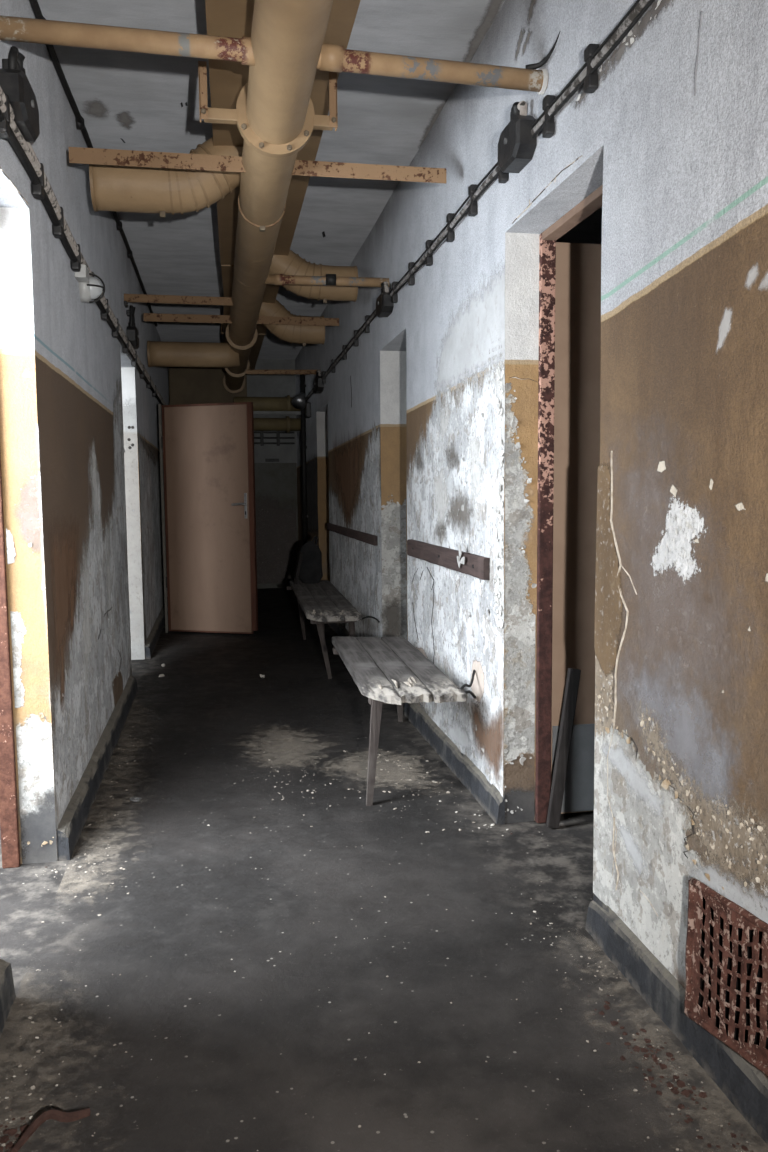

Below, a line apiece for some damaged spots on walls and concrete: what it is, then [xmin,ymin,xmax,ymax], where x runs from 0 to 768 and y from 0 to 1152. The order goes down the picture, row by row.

peeling [10,378,168,846]
peeling [329,352,537,814]
crack [607,451,695,917]
peeling [650,484,706,584]
peeling [593,700,768,984]